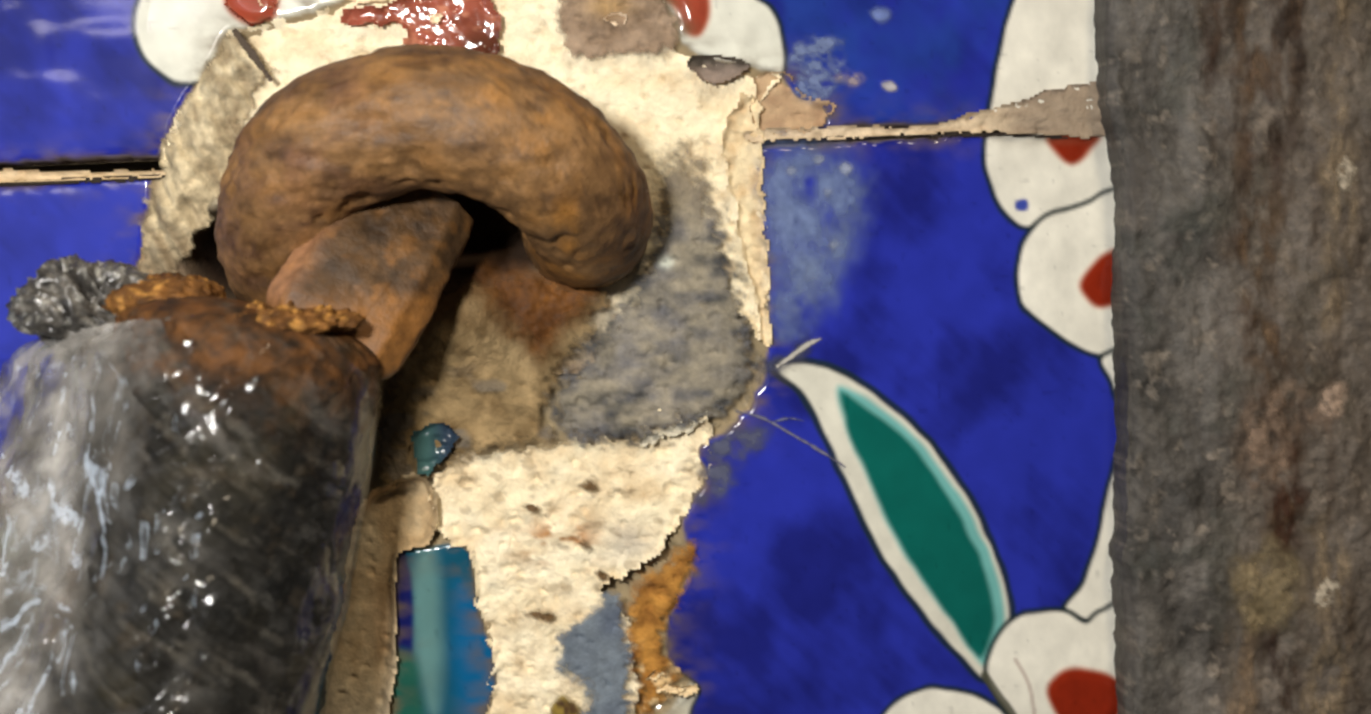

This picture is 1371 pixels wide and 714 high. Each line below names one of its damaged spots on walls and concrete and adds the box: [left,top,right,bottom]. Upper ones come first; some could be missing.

spalling [163,110,183,162]
crack [824,132,1068,140]
crack [0,174,166,186]
spalling [224,0,836,379]
spalling [176,186,237,300]
corrosion [100,272,227,315]
corrosion [232,299,366,336]
spalling [427,409,713,714]
corrosion [626,545,699,713]